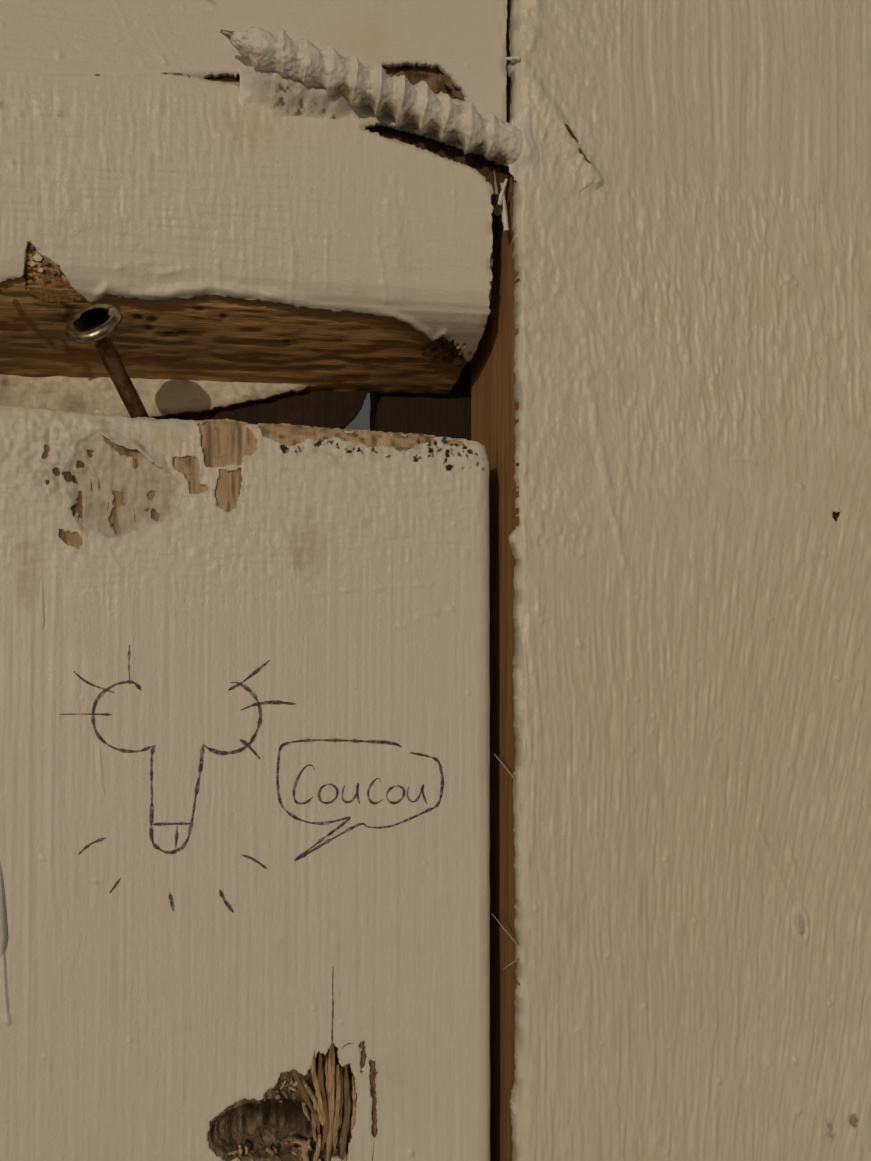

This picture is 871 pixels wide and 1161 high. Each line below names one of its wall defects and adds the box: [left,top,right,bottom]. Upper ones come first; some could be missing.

peeling [383,65,465,101]
peeling [23,244,81,302]
peeling [42,445,125,534]
peeling [134,491,160,521]
peeling [94,410,464,512]
peeling [59,529,83,549]
hole [207,1041,378,1161]